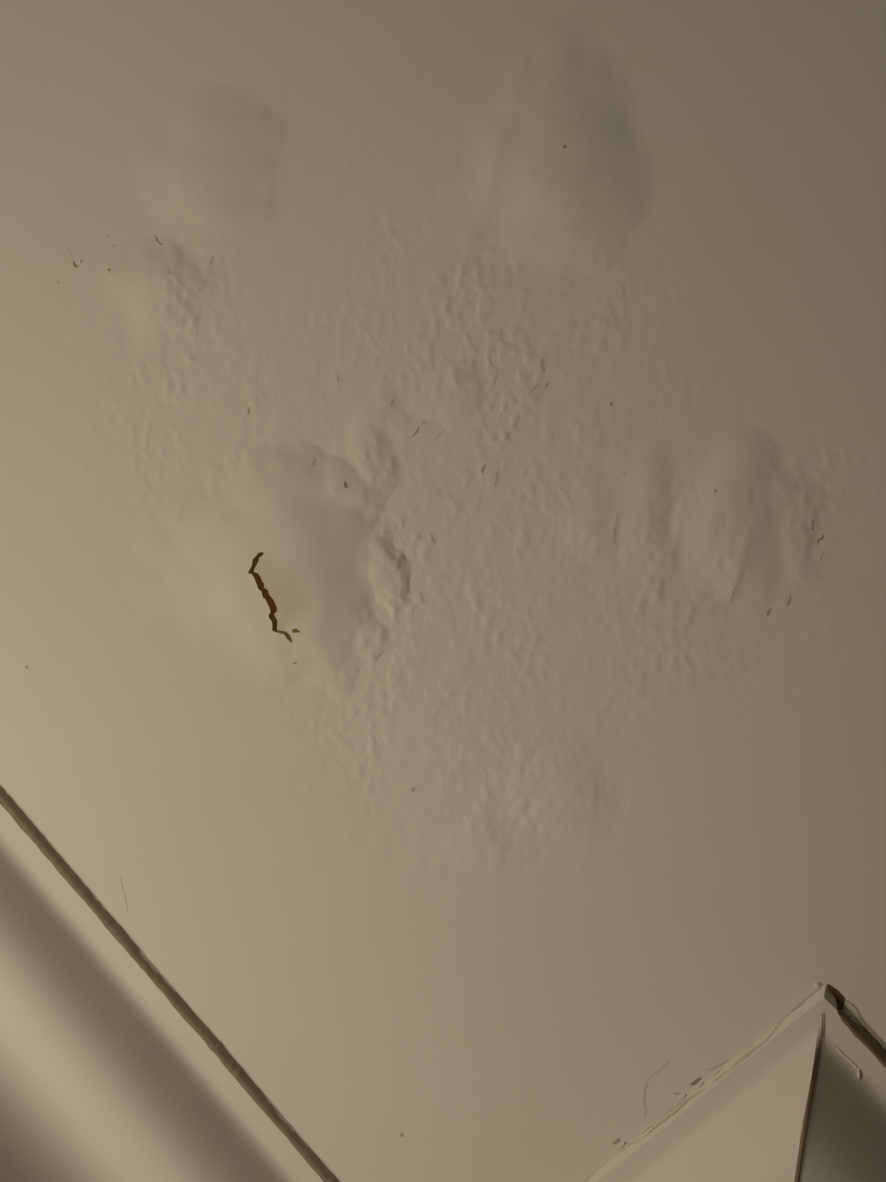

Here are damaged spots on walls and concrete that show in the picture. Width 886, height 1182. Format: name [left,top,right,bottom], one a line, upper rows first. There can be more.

crack [247,551,300,642]